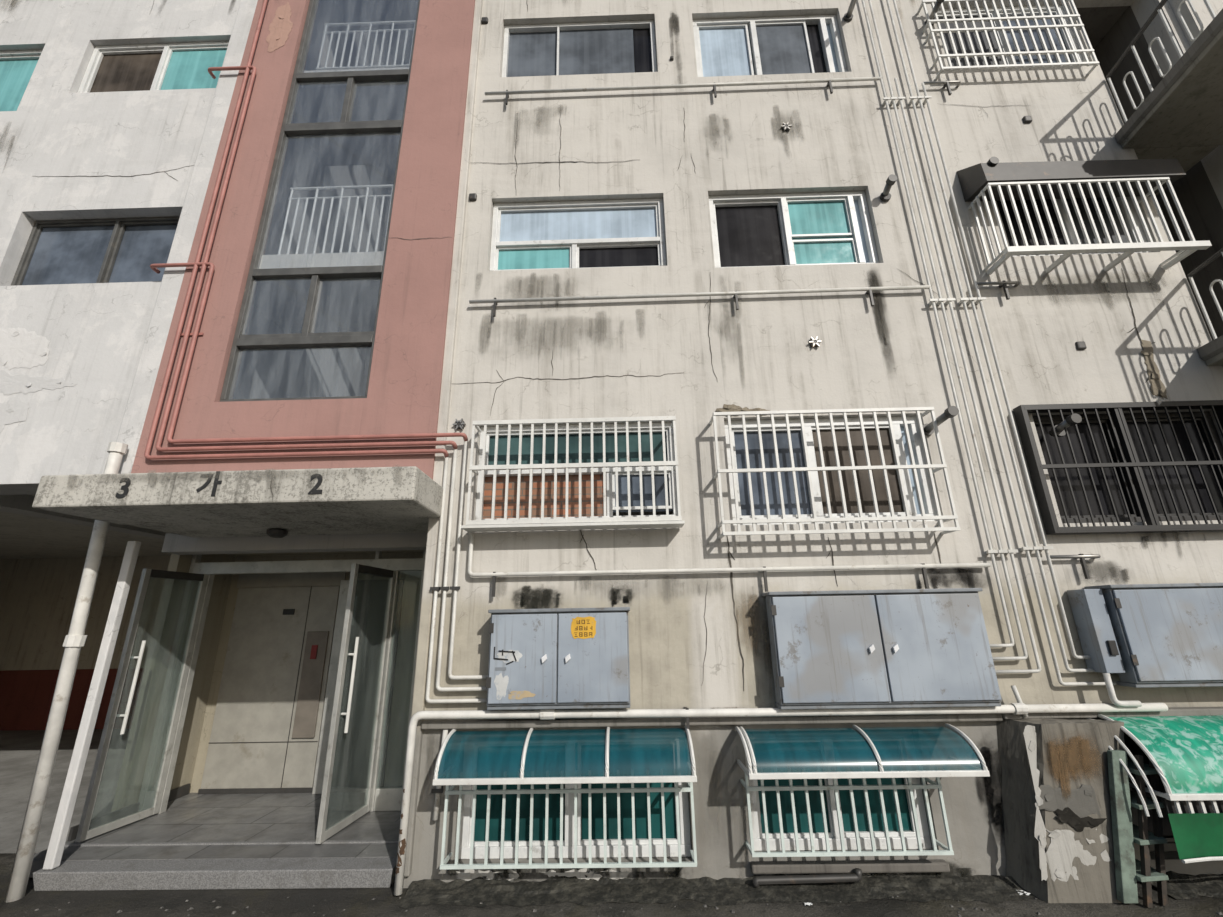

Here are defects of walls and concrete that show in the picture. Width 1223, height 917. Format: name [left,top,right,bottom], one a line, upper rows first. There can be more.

peeling [266,2,293,52]
crack [36,165,193,179]
crack [704,278,717,378]
damp [870,273,892,357]
crack [1121,268,1155,346]
peeling [0,370,76,433]
crack [462,355,675,415]
crack [702,536,744,691]
peeling [1023,725,1112,882]
corrosion [1050,737,1100,797]